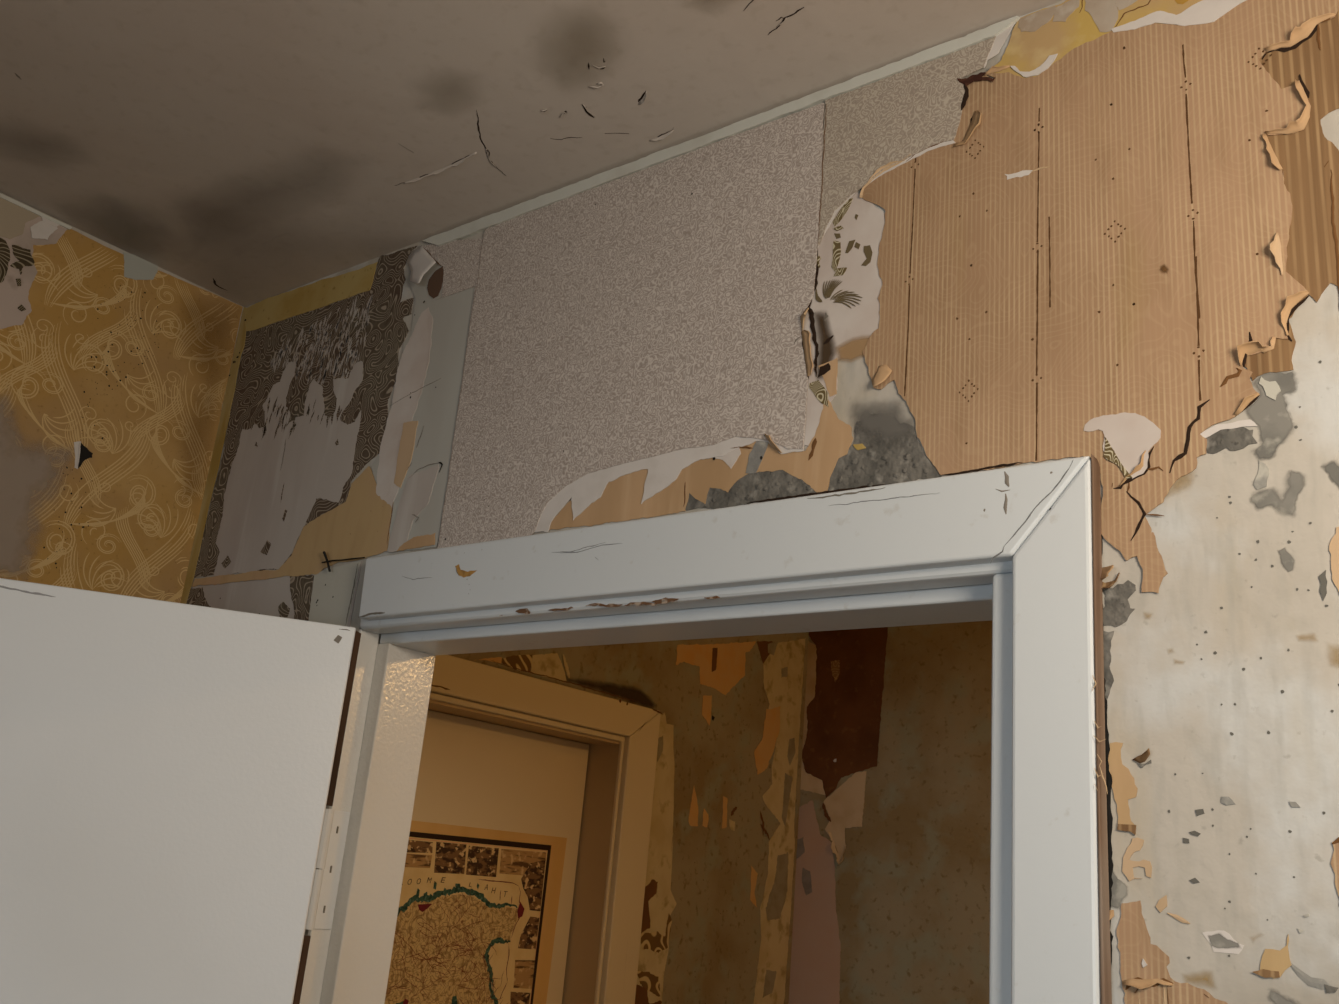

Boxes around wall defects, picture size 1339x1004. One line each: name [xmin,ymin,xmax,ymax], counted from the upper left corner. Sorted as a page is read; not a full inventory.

crack [744,0,804,35]
crack [395,111,505,186]
peeling [10,216,59,286]
crack [1286,295,1309,342]
spalling [685,406,942,511]
crack [1112,332,1260,540]
spalling [1200,372,1304,515]
spalling [1323,462,1339,487]
spalling [1238,531,1294,572]
spalling [1296,570,1328,607]
spalling [1103,580,1136,700]
peeling [641,879,658,933]